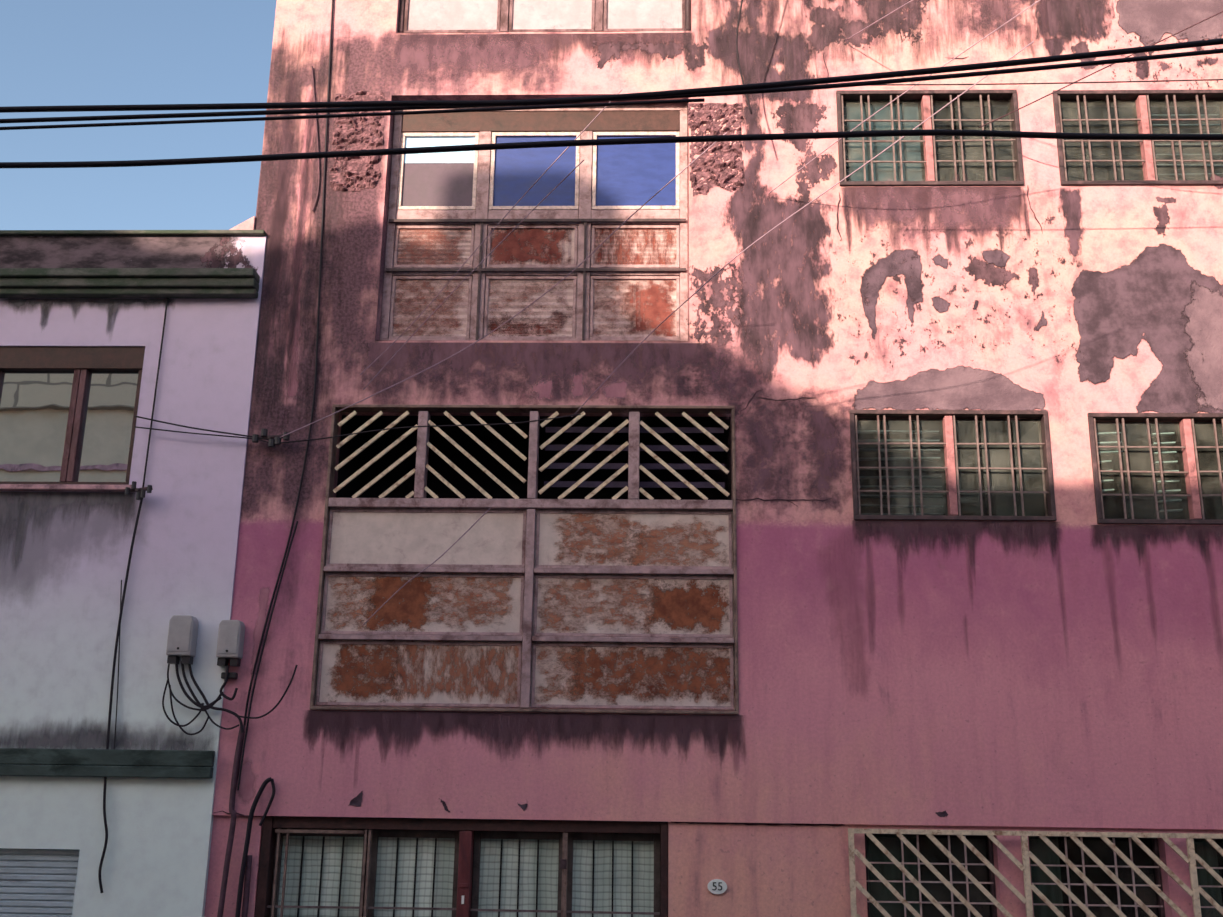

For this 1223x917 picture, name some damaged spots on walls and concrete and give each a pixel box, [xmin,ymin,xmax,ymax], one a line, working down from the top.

water stain [970,0,1218,90]
spalling [688,103,744,197]
rust [593,228,676,337]
water stain [364,0,1084,508]
peeling [860,249,950,339]
peeling [1071,244,1223,413]
water stain [1153,196,1176,238]
crack [741,389,815,411]
peeling [852,365,1045,410]
rust [328,573,522,704]
rust [534,509,735,705]
water stain [305,710,745,758]